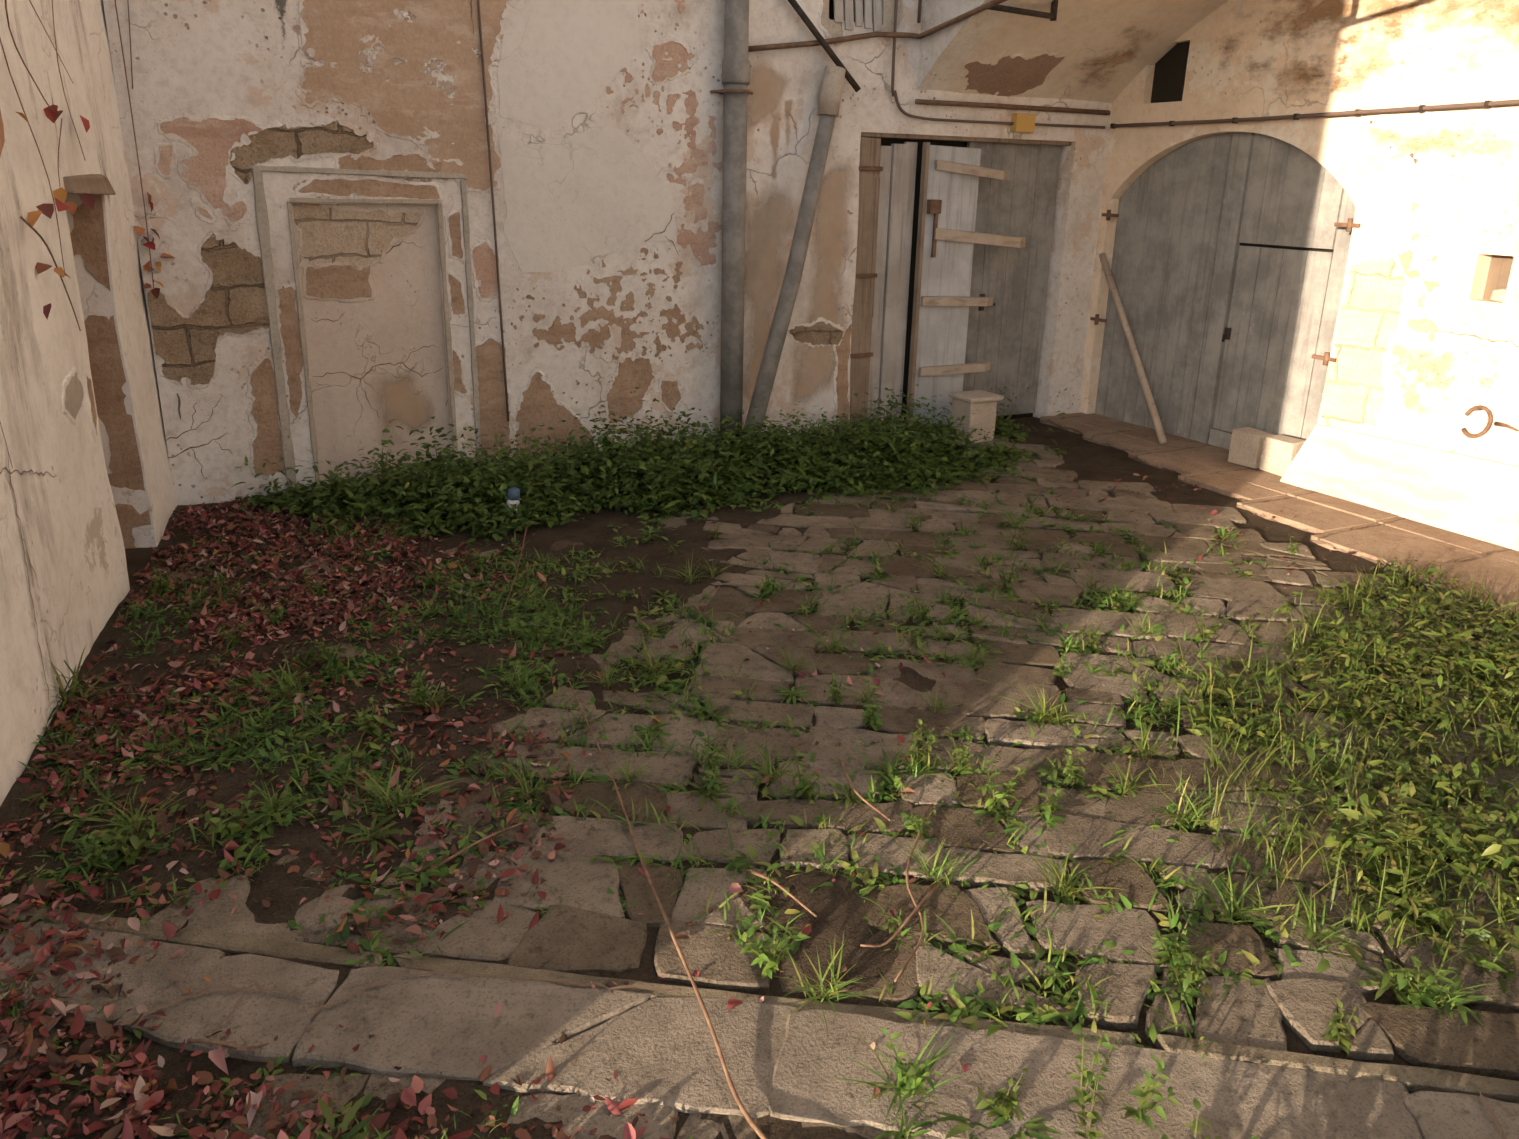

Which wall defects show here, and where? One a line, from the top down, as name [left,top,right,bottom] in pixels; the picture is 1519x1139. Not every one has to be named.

water stain [275,0,286,36]
water stain [1273,0,1519,42]
peeling [959,51,1066,97]
peeling [146,0,520,483]
flaking render [452,38,723,461]
crack [313,344,442,416]
crack [166,393,232,477]